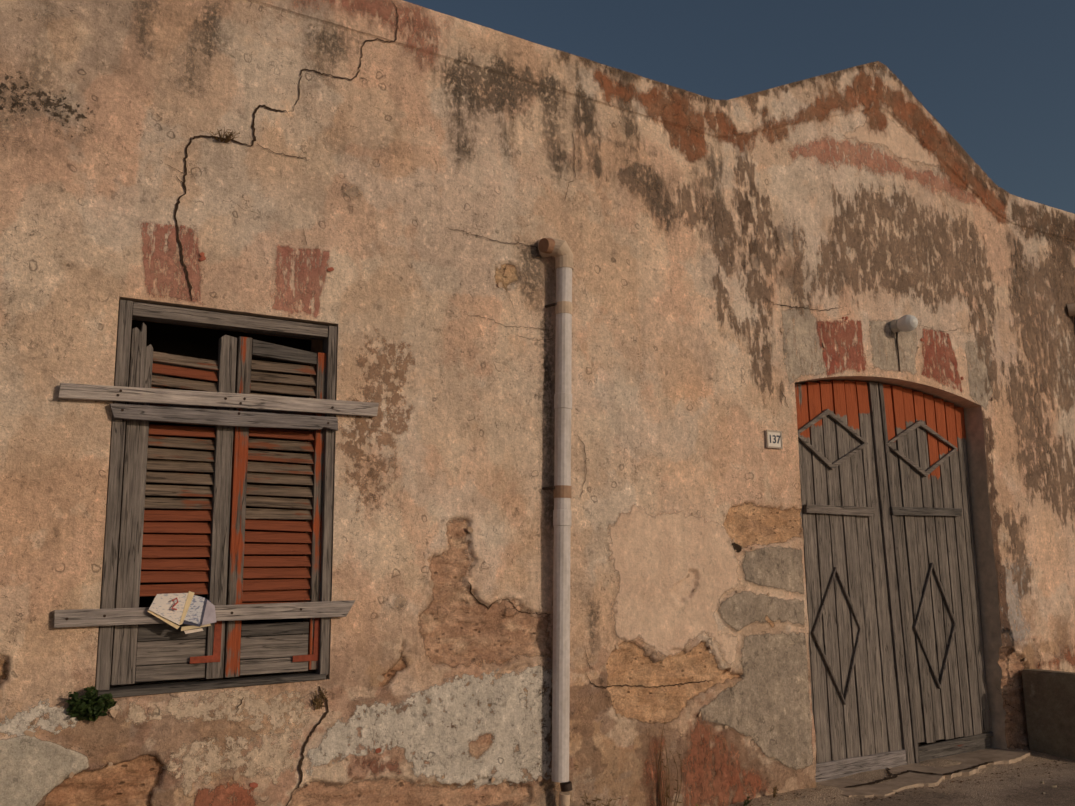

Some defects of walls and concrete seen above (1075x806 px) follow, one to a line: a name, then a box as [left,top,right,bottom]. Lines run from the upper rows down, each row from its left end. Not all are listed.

damp [0,73,95,137]
crack [168,0,399,301]
damp [447,56,569,177]
damp [559,51,727,147]
damp [742,61,922,127]
damp [593,148,784,403]
damp [793,116,1075,529]
peeling [0,699,78,737]
peeling [44,519,553,806]
crack [286,686,329,806]
peeling [606,502,802,724]
damp [982,411,1031,660]